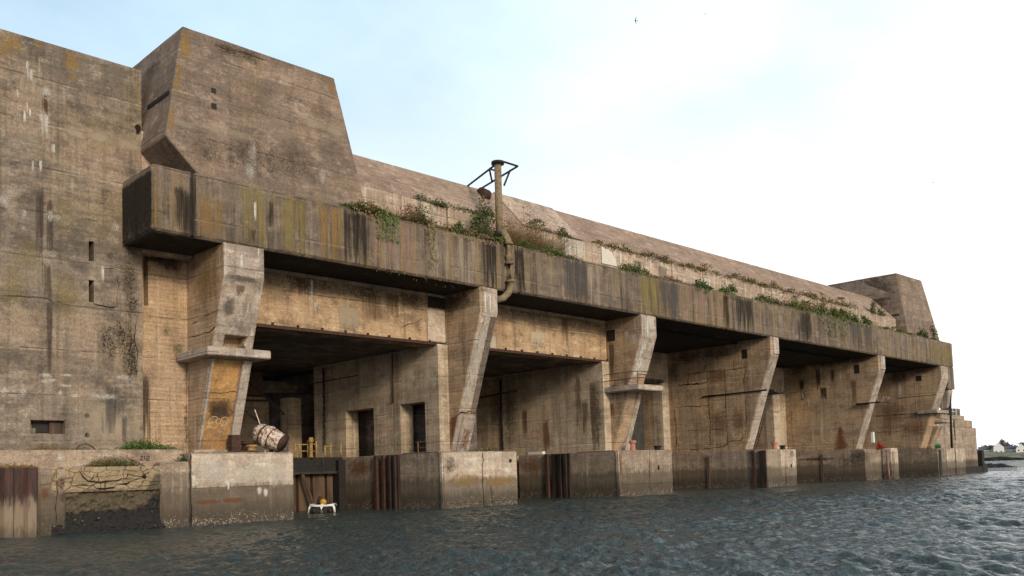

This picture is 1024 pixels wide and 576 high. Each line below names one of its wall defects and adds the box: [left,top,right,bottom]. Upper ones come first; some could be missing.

damp [114,171,152,245]
damp [174,177,210,233]
damp [244,194,306,256]
damp [320,208,414,266]
damp [515,249,525,292]
damp [562,237,621,302]
damp [635,262,710,316]
damp [101,261,150,435]
rust [803,428,846,460]
crack [41,459,156,528]